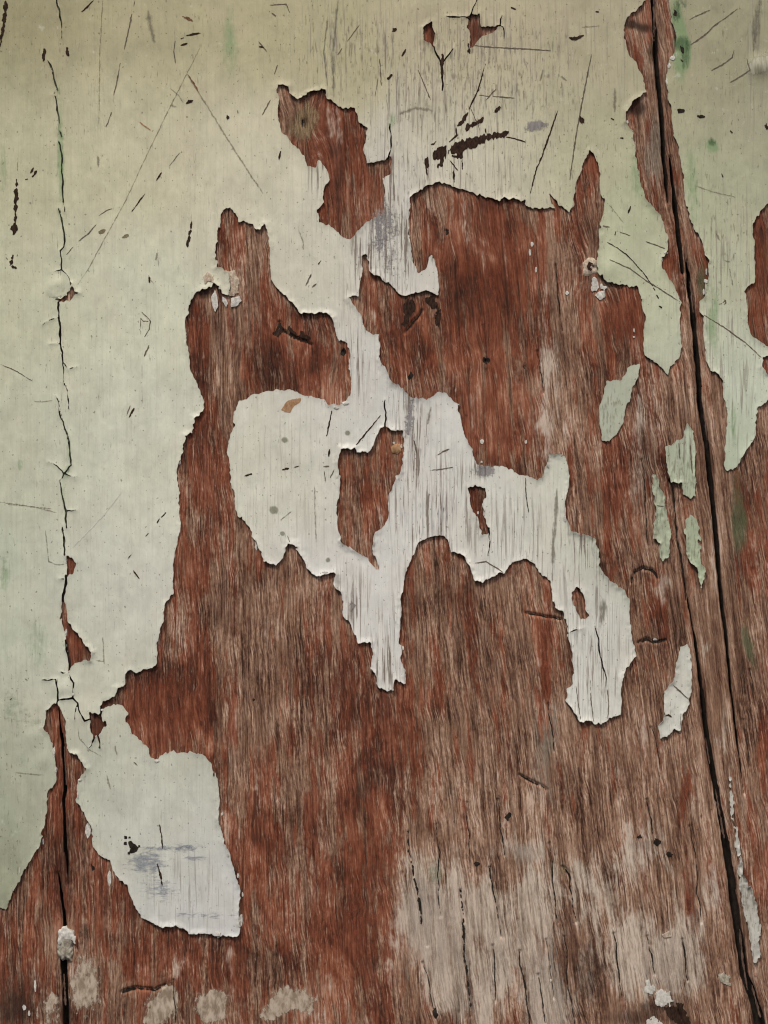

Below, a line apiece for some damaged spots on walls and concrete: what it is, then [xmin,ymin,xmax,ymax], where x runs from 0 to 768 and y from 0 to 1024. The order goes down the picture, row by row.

crack [48,61,74,602]
peeling [55,282,78,306]
peeling [276,84,392,239]
peeling [461,14,499,48]
peeling [624,0,715,399]
peeling [60,150,768,975]
crack [631,0,765,1024]
peeling [0,703,64,958]
crack [43,640,103,926]
crack [61,959,69,1024]